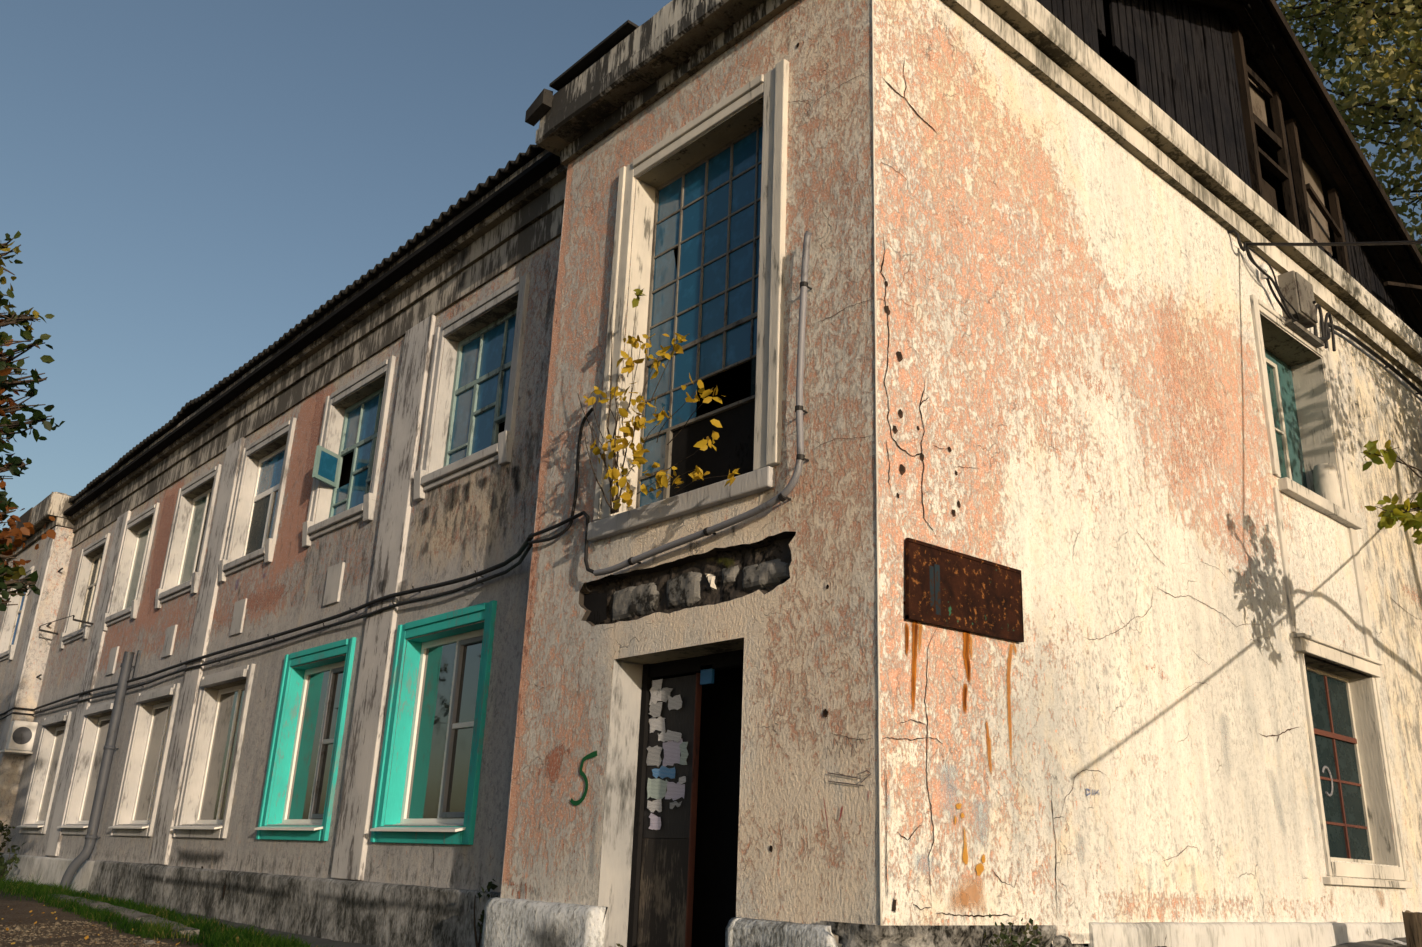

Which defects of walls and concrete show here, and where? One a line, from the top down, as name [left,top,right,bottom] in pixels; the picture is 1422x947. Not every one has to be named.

crack [793,58,938,134]
crack [815,235,972,540]
spalling [579,531,796,626]
crack [1085,532,1257,640]
rust [905,621,923,712]
rust [963,631,973,713]
rust [1007,644,1017,759]
crack [831,626,1018,917]
water stain [179,852,220,861]
water stain [145,877,288,897]